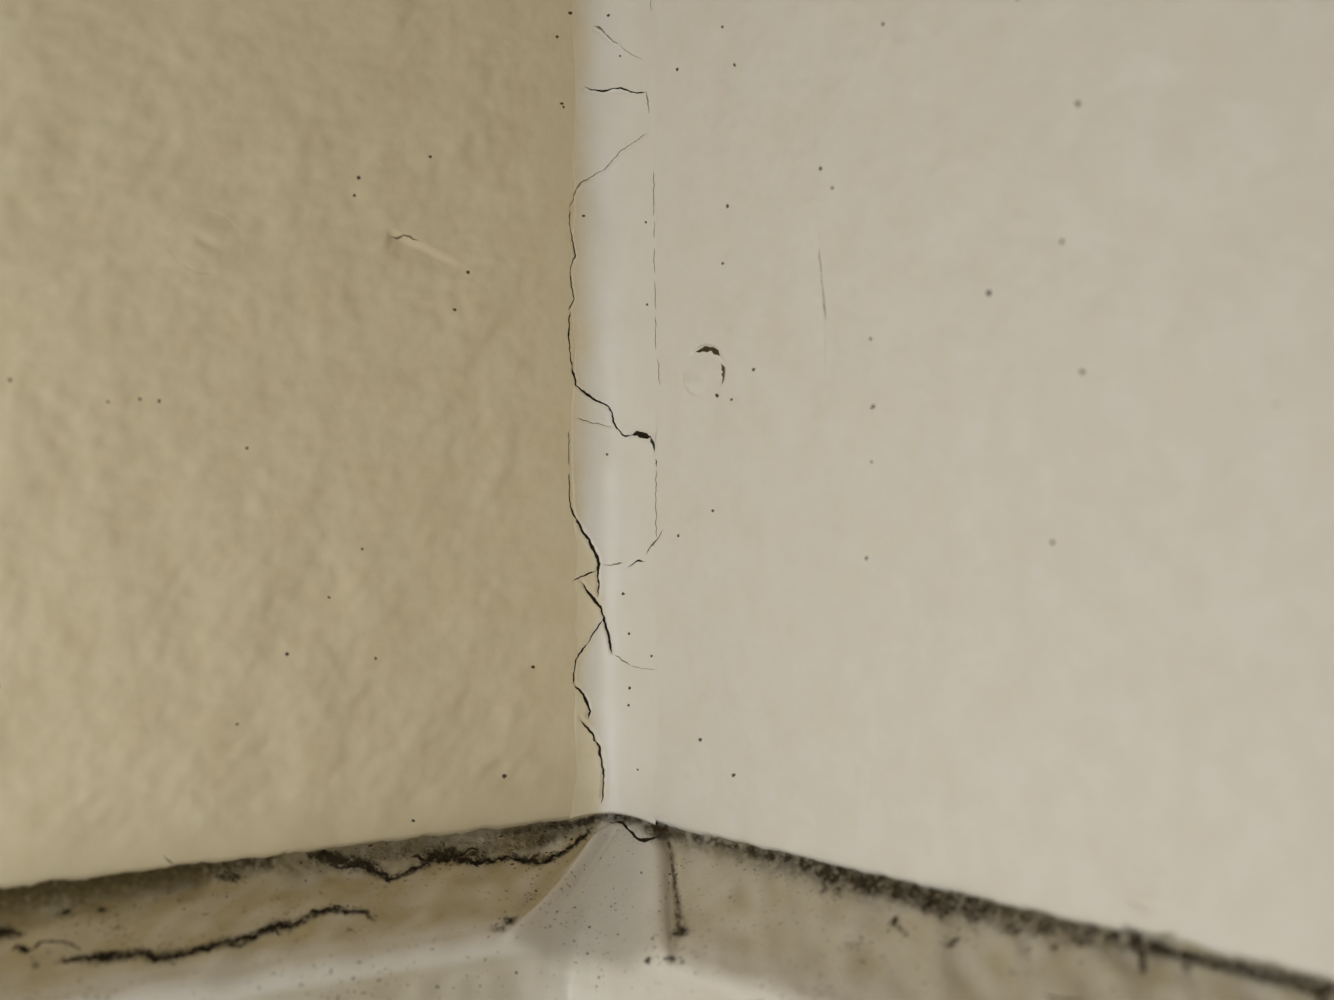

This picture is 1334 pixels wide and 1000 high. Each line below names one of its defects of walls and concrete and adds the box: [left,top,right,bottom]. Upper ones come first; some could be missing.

crack [594,26,641,59]